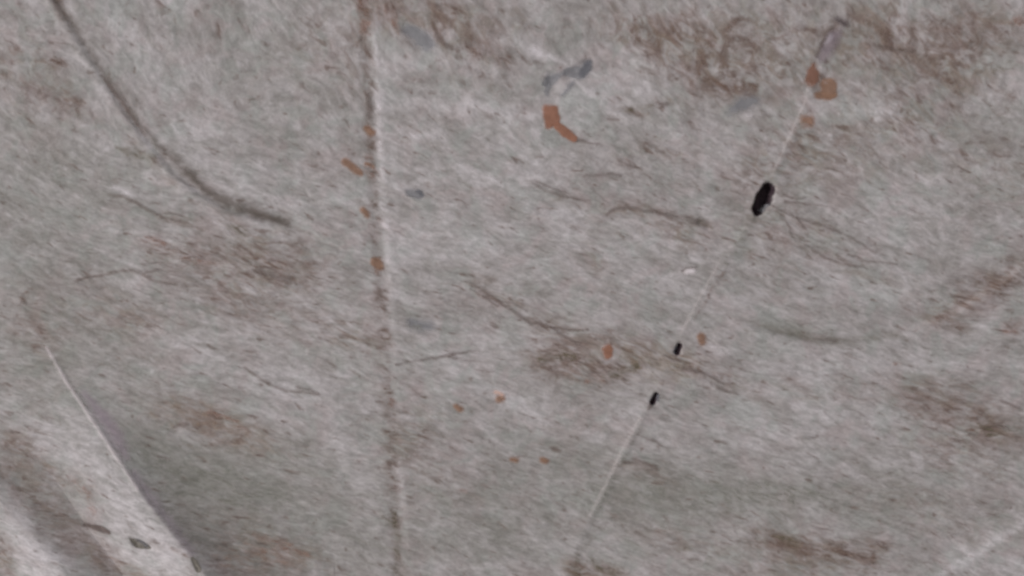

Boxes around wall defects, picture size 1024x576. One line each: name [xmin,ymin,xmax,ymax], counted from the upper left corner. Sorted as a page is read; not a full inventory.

corrosion [806,63,836,99]
corrosion [543,106,577,142]
corrosion [342,159,374,175]
corrosion [371,258,383,270]